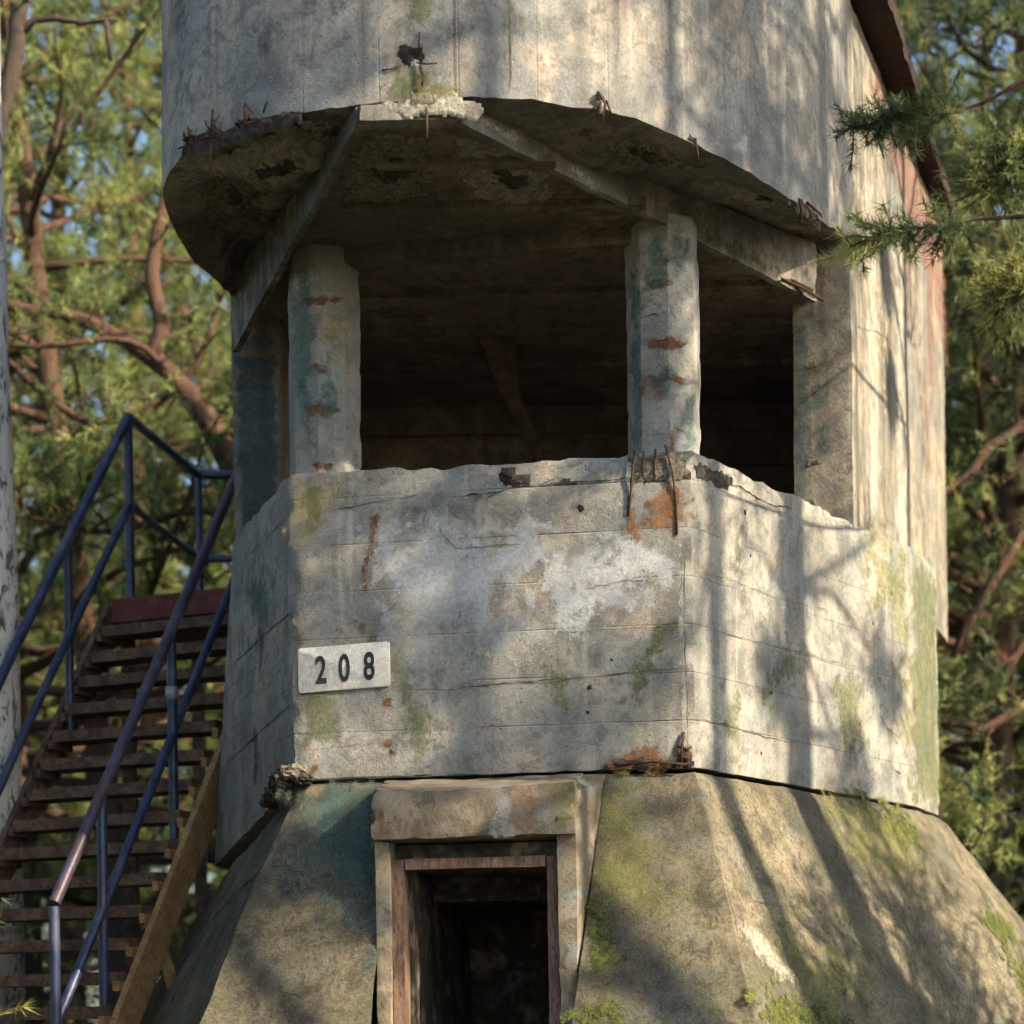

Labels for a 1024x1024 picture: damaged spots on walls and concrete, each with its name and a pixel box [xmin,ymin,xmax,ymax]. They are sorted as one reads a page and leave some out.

spalling [381,31,484,138]
spalling [178,101,322,219]
spalling [627,344,733,535]
crack [335,477,644,510]
spalling [498,467,531,488]
rust [627,482,697,539]
rust [362,514,378,589]
crack [391,536,912,747]
spalling [258,763,315,810]
crack [314,773,482,781]